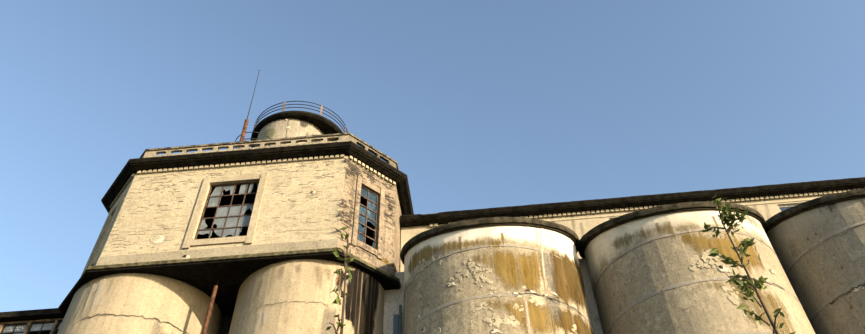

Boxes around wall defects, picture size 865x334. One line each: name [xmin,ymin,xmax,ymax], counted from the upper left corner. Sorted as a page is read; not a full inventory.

water stain [331,269,379,334]
water stain [408,228,593,334]
peeling [447,258,558,334]
water stain [613,216,763,271]
peeling [689,249,731,273]
peeling [721,285,740,306]
water stain [715,283,794,334]
crack [826,284,865,306]